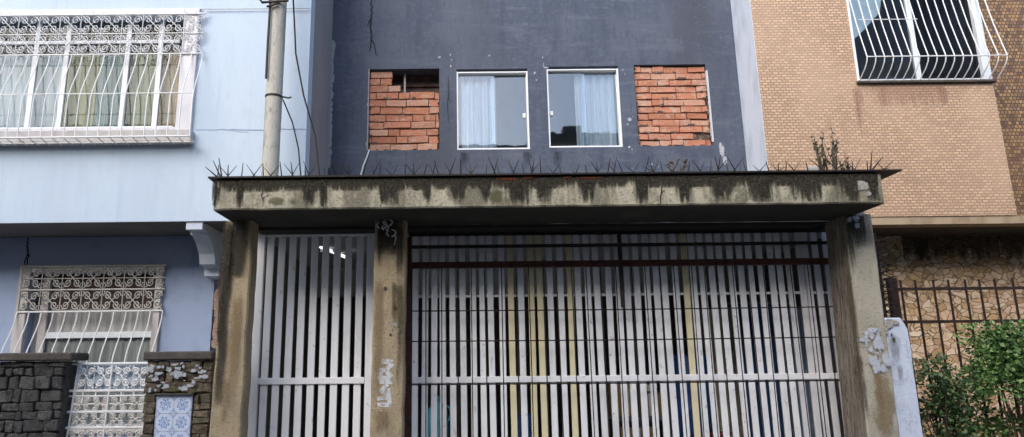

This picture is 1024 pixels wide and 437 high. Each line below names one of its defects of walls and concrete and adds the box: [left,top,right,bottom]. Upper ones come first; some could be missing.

crack [367,0,377,56]
water stain [212,173,880,207]
peeling [860,318,899,374]
peeling [145,362,208,393]